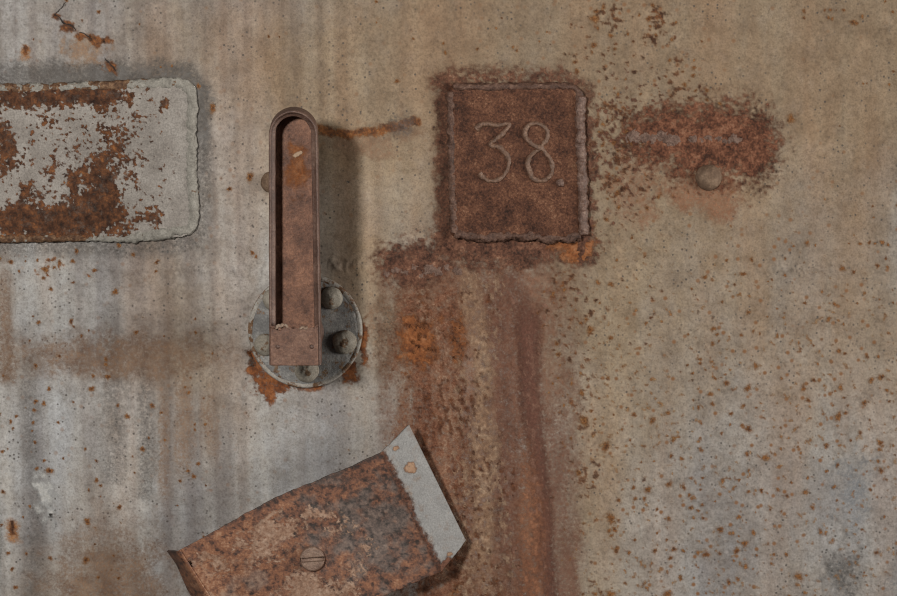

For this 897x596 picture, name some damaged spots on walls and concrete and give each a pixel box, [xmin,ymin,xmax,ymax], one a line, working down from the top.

peeling [0,85,174,238]
corrosion [317,116,421,158]
corrosion [370,3,794,596]
corrosion [246,350,323,406]
corrosion [342,323,369,383]